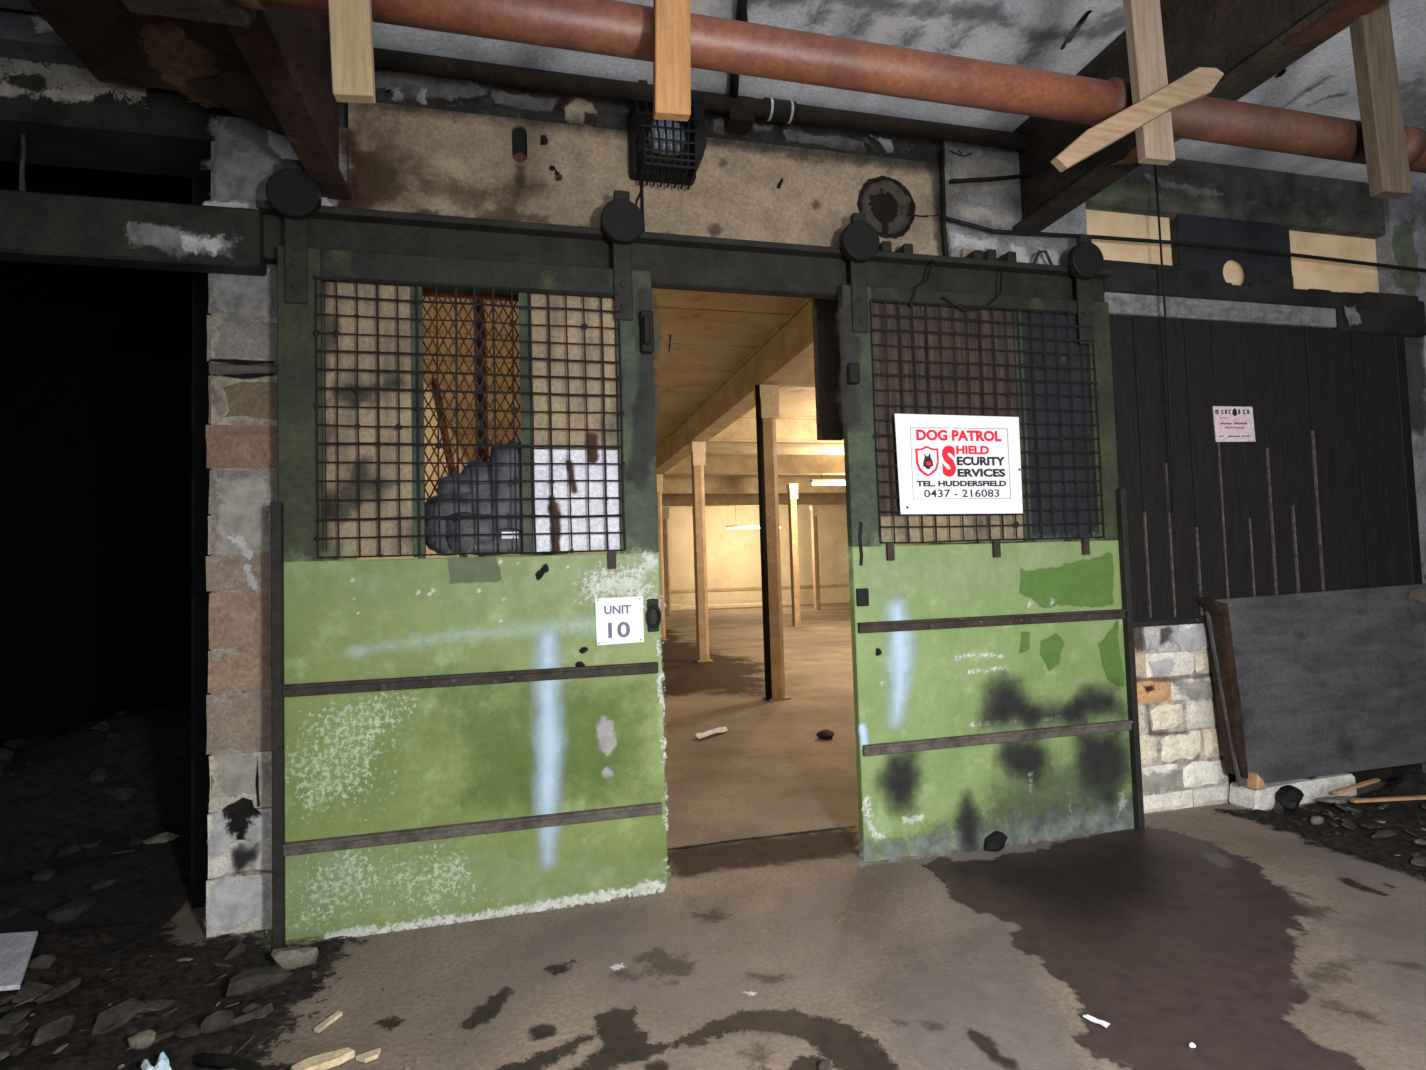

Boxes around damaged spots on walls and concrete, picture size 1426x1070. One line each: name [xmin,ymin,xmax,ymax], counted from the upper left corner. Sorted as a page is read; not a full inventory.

peeling [32,15,52,33]
rust [1285,0,1389,46]
peeling [0,57,150,106]
peeling [203,118,307,210]
peeling [126,221,232,258]
peeling [210,266,274,323]
water stain [922,827,1366,1070]